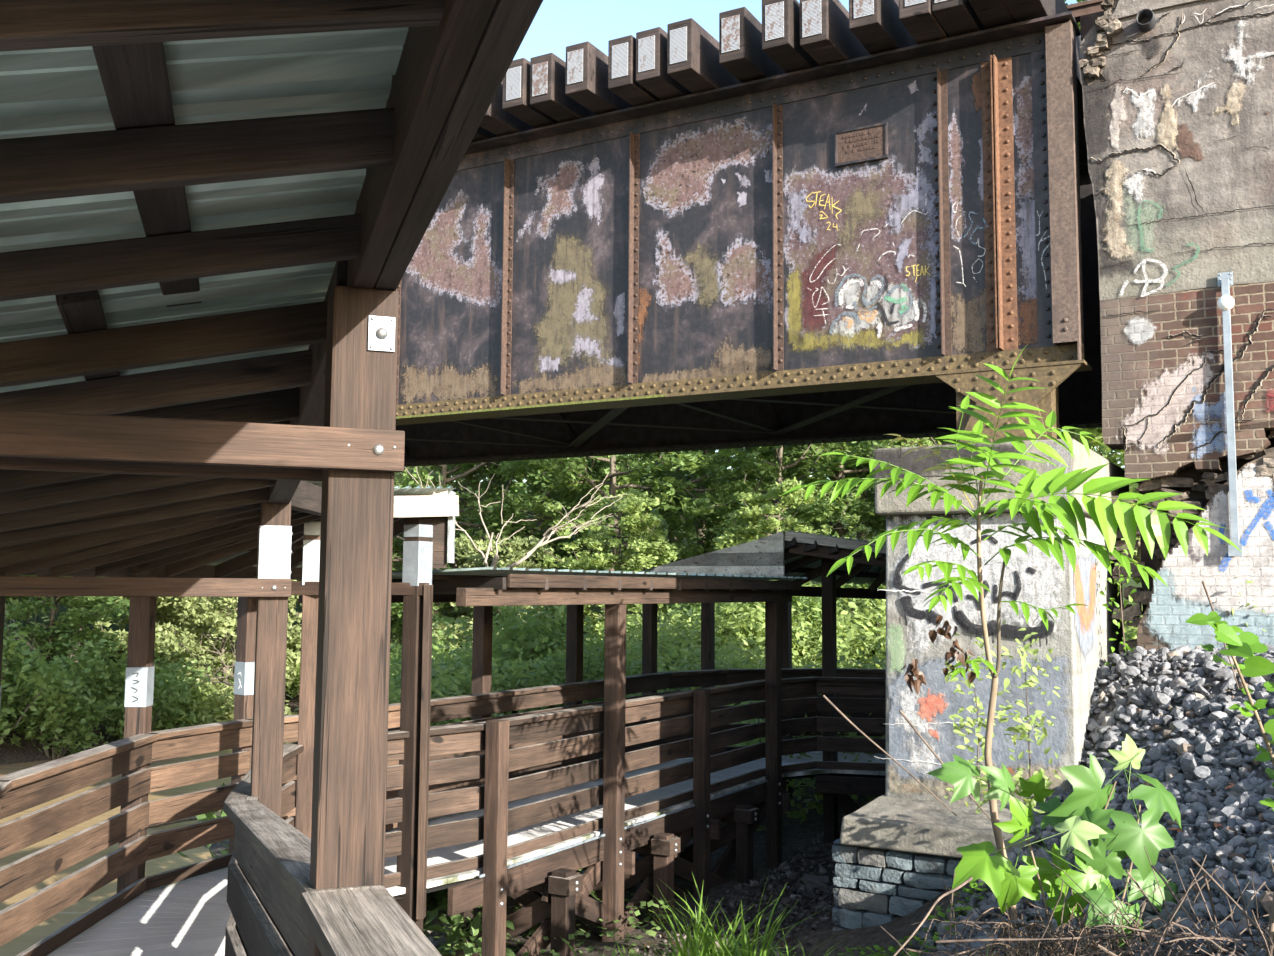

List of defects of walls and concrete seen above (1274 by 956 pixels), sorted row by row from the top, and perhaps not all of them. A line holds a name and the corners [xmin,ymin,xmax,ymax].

spalling [1079,0,1123,86]
crack [1086,0,1274,106]
crack [1090,144,1274,226]
spalling [1176,124,1204,161]
peeling [400,108,987,404]
crack [1173,243,1274,254]
crack [1106,309,1274,451]